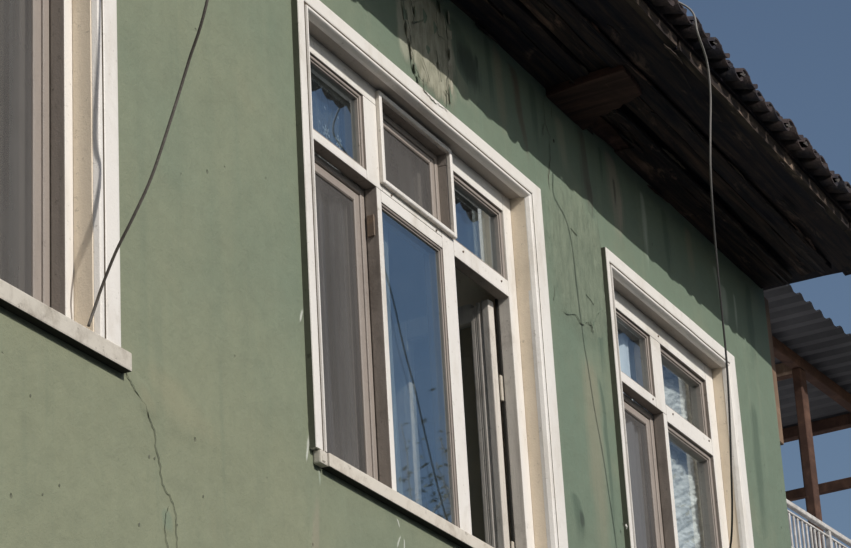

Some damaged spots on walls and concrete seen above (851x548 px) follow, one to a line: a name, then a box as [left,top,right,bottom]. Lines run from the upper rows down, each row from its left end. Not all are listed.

flaking render [390,0,463,122]
water stain [637,185,652,285]
crack [126,373,178,548]